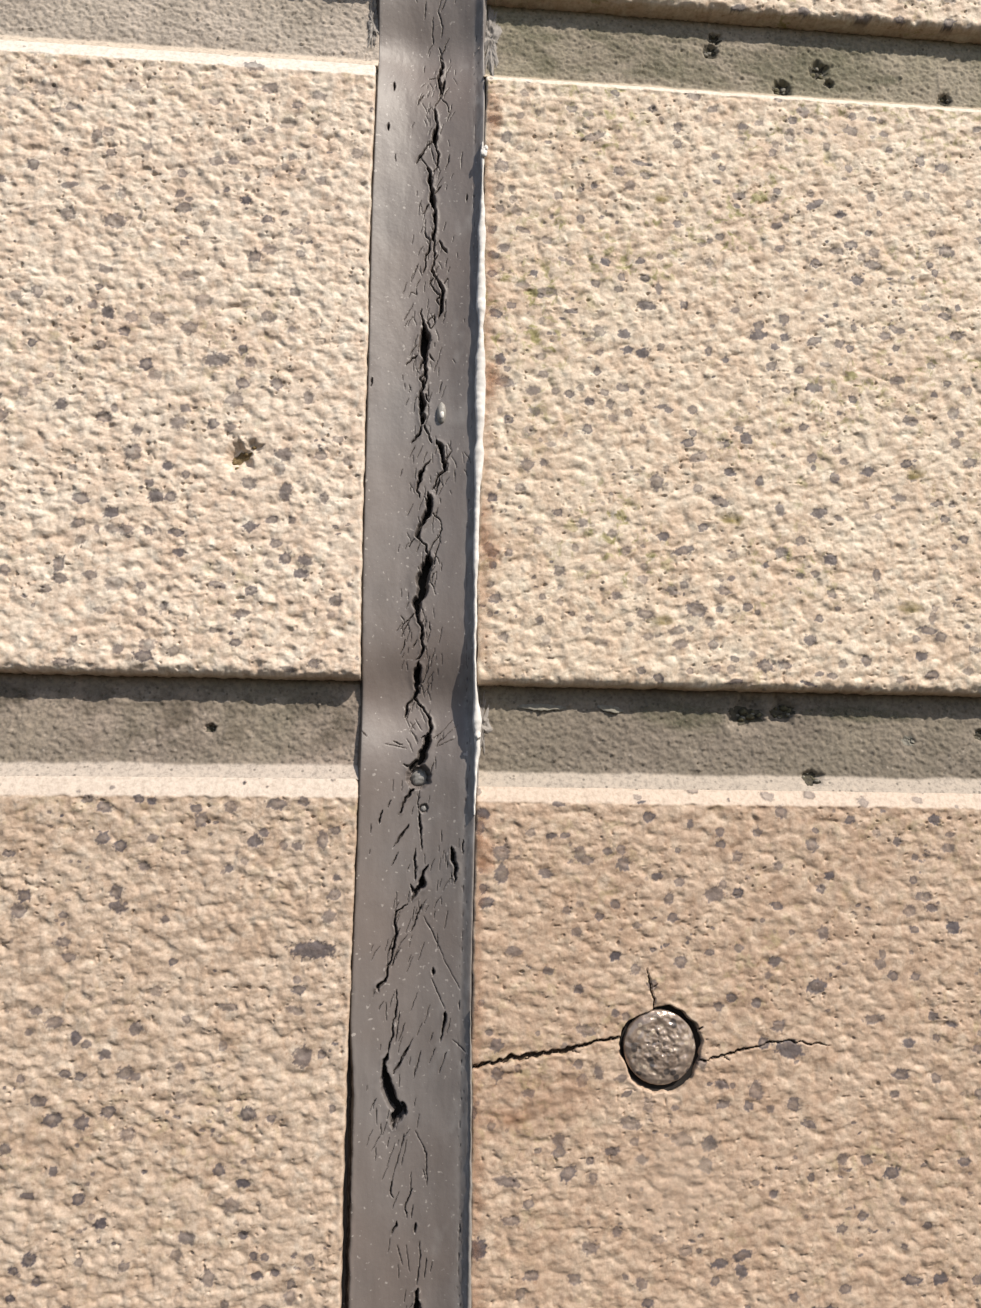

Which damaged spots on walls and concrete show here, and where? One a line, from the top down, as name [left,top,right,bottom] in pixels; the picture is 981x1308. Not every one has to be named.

crack [345,0,620,1308]
crack [695,1027,830,1061]